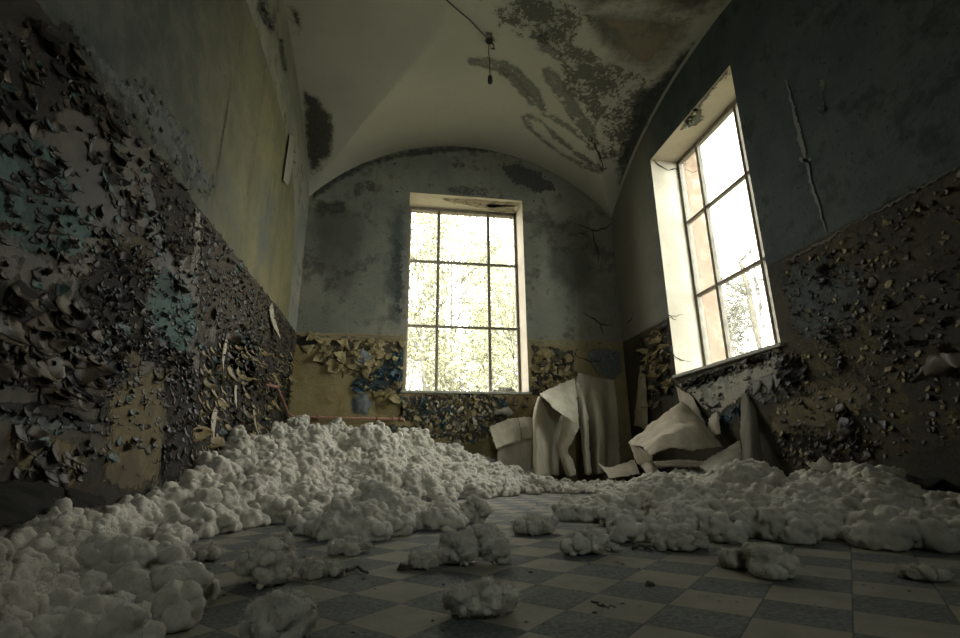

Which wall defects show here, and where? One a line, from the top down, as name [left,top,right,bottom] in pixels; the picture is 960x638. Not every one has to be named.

spalling [256,0,287,72]
water stain [591,0,683,65]
water stain [304,92,333,169]
water stain [499,161,556,193]
water stain [469,44,602,173]
water stain [618,43,695,184]
crack [784,80,826,232]
peeling [0,16,432,494]
water stain [390,239,406,314]
peeling [634,167,960,473]
peeling [507,343,578,417]